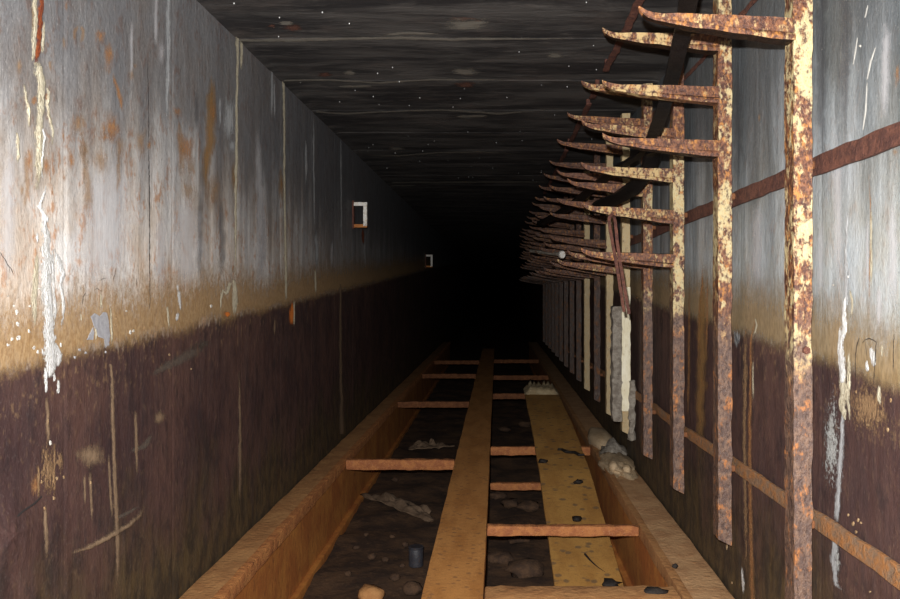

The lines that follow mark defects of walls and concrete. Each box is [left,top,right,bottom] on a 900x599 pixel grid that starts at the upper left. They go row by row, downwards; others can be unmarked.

rust [31,0,45,62]
rust [204,88,215,185]
damp [0,32,573,434]
peeling [80,293,113,353]
damp [652,272,670,307]
damp [683,278,713,321]
damp [731,288,785,345]
damp [811,217,900,519]
damp [77,364,120,576]
damp [134,414,151,469]
damp [830,542,840,586]